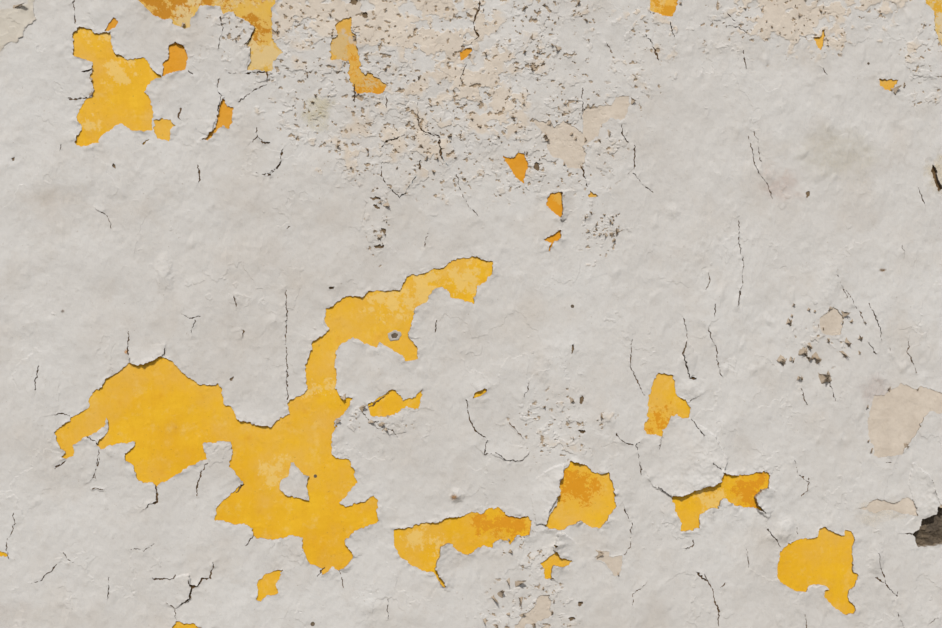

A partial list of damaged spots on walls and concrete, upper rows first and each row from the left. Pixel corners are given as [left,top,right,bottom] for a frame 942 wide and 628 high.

peeling [650,0,682,16]
peeling [712,0,858,60]
peeling [926,0,942,45]
peeling [72,17,188,147]
peeling [139,0,636,252]
crack [748,132,773,199]
peeling [54,256,493,575]
crack [466,400,529,462]
peeling [638,373,779,532]
peeling [394,391,617,628]
spalling [860,463,942,547]
peeling [777,527,859,615]